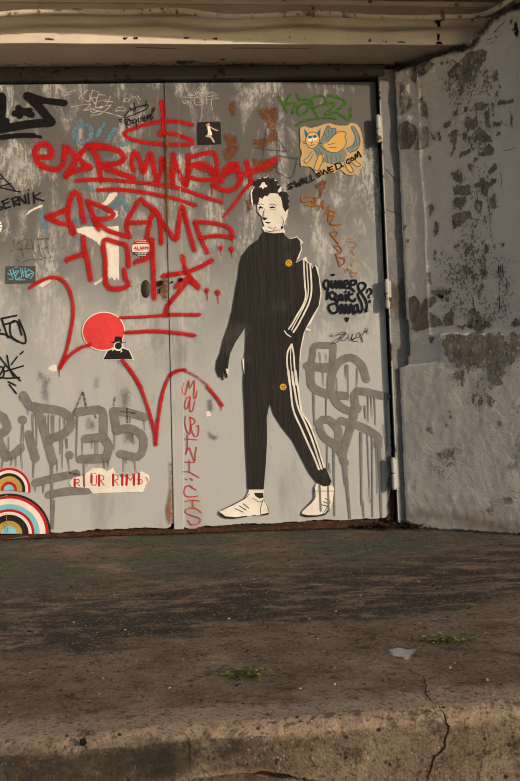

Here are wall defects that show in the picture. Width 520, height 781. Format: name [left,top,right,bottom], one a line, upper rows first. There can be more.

peeling [397,35,520,407]
crack [408,669,450,781]